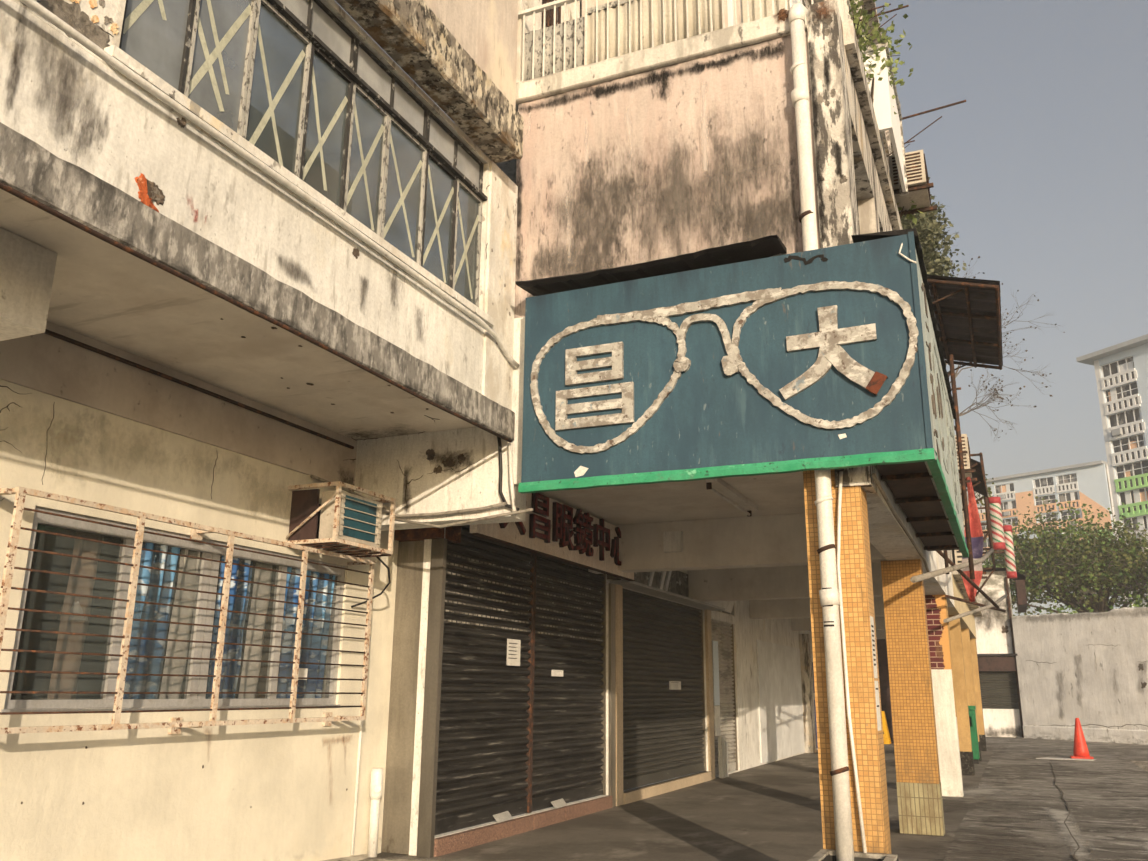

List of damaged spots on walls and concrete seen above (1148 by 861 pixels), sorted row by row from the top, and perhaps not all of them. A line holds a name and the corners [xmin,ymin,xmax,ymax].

damp [8,10,25,104]
damp [40,40,91,129]
peeling [36,0,119,50]
spalling [135,173,165,212]
damp [521,43,794,277]
damp [809,42,830,240]
damp [279,257,309,283]
crack [0,385,54,485]
crack [1052,770,1093,861]